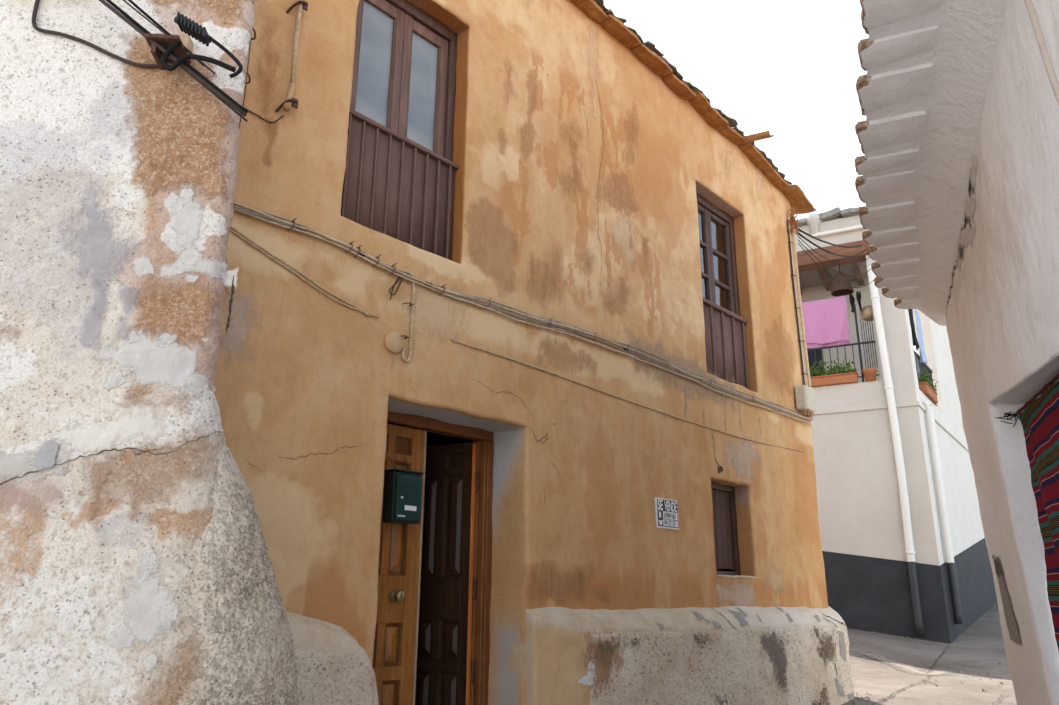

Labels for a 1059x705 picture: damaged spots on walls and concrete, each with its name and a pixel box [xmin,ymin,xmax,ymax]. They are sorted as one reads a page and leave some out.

peeling [132,184,239,286]
crack [0,433,213,485]
crack [246,444,362,473]
crack [473,380,562,504]
damp [761,631,788,693]
damp [814,628,835,664]
crack [823,614,1004,705]